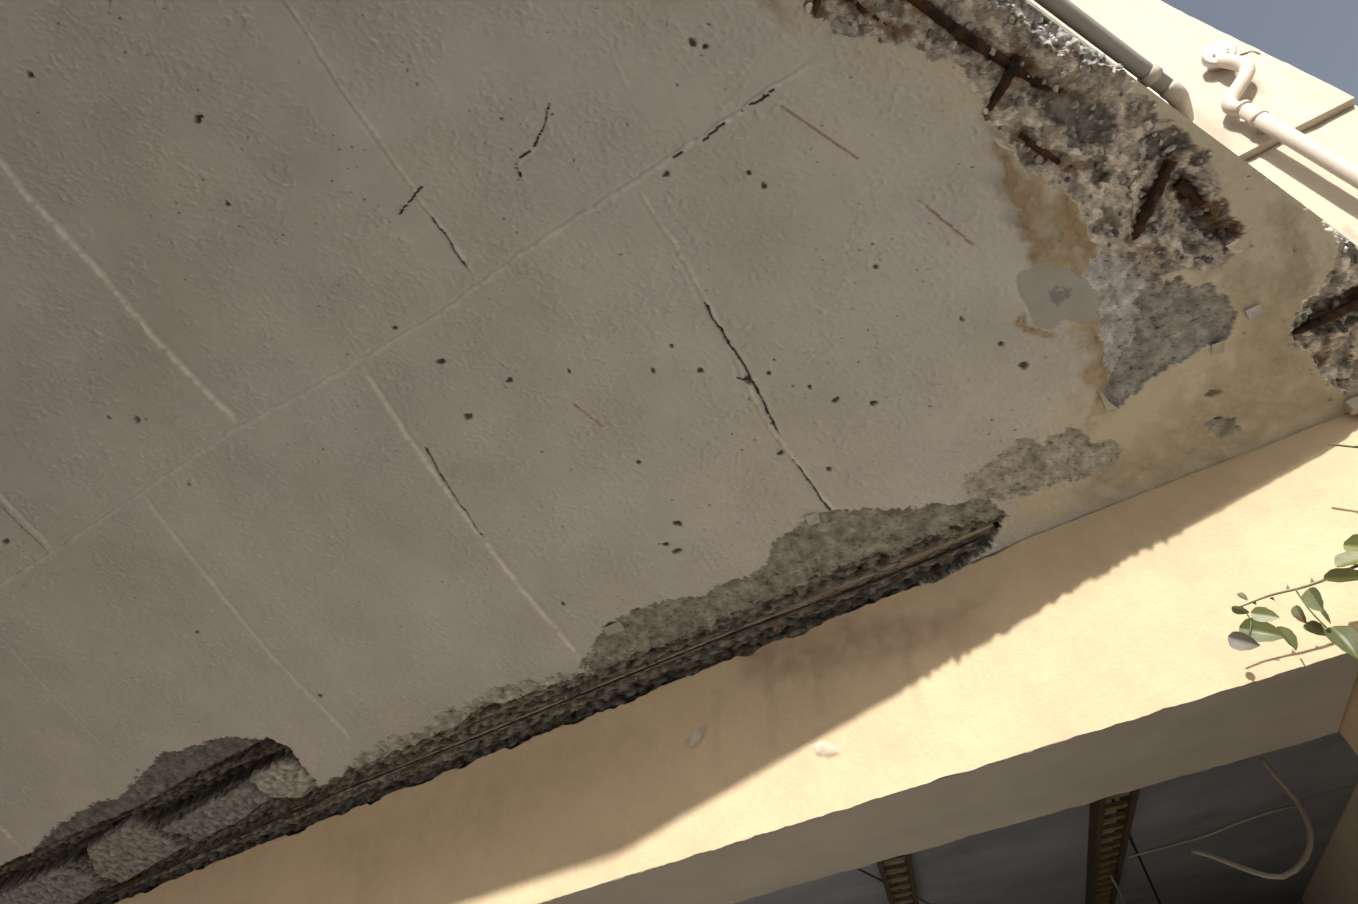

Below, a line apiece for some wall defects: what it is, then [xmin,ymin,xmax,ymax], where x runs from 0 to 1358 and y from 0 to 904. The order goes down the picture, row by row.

crack [514,103,549,177]
crack [671,88,773,158]
crack [397,186,466,267]
spalling [802,0,1264,411]
rust [1004,159,1098,261]
spalling [1286,220,1358,393]
crack [703,302,776,430]
crack [1,506,47,551]
crack [423,446,483,537]
crack [791,459,830,511]
peeling [343,424,1123,773]
spalling [0,736,328,904]